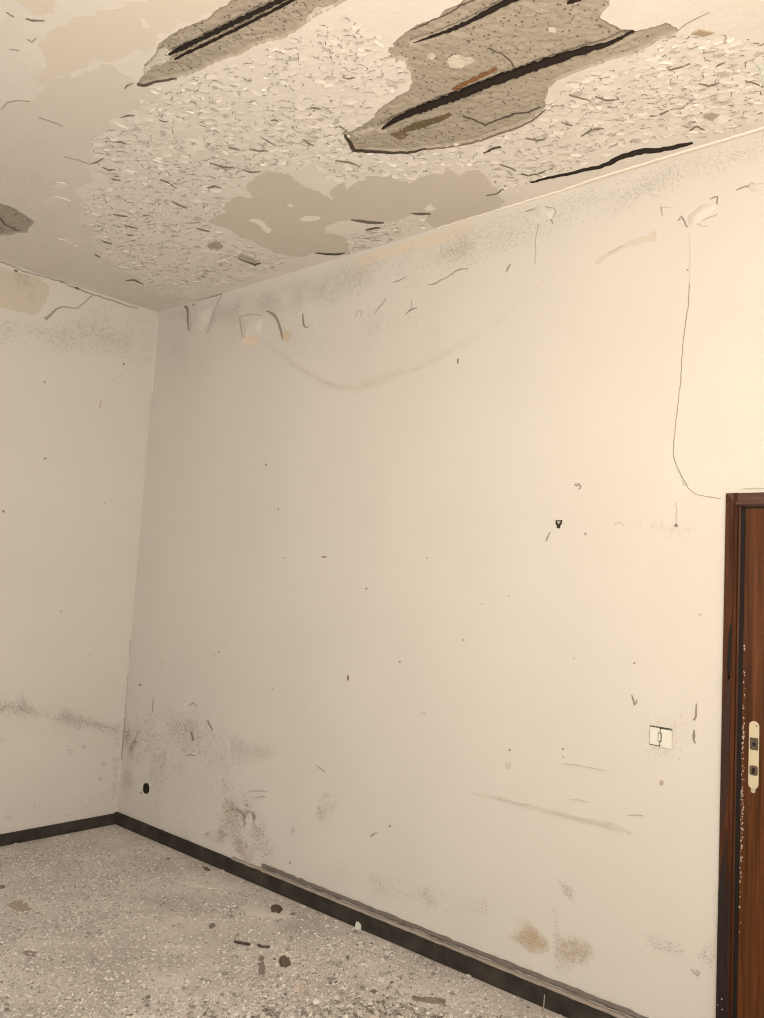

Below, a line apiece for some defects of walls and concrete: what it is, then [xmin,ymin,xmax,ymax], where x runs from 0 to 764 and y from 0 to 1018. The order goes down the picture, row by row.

spalling [85,0,764,291]
crack [486,142,693,196]
spalling [0,204,35,236]
crack [506,206,556,272]
crack [660,182,754,523]